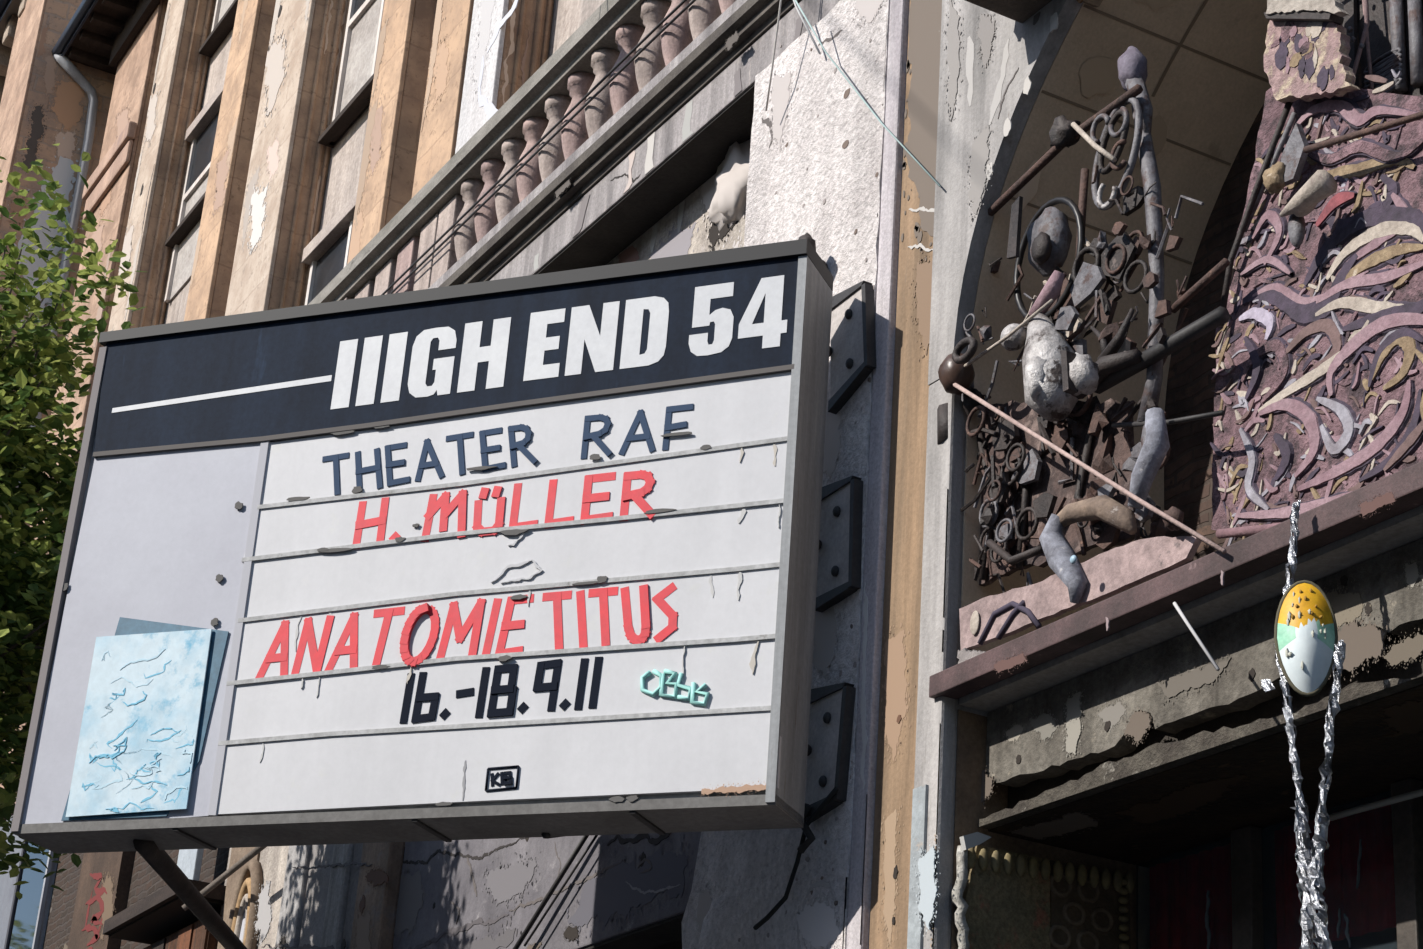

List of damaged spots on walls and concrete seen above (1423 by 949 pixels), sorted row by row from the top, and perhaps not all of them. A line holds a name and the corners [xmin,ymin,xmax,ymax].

spalling [1023,76,1032,95]
spalling [1003,117,1012,137]
peeling [7,26,88,325]
spalling [1324,579,1423,682]
spalling [1004,723,1024,764]
spalling [1104,707,1154,746]
crack [293,833,680,949]
crack [840,877,848,949]
crack [261,941,334,949]